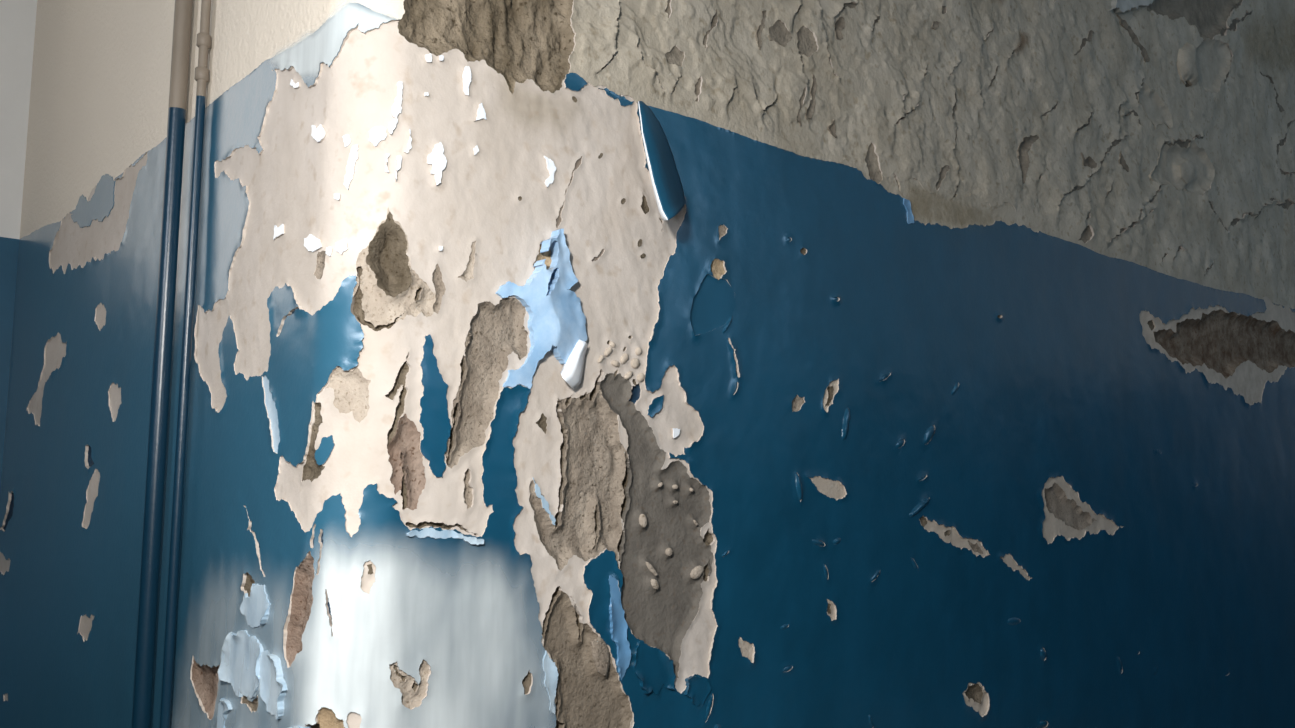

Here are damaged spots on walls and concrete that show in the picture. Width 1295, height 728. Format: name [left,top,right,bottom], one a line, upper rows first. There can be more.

crack [842,2,880,31]
crack [924,29,1019,141]
crack [1041,14,1203,219]
crack [1220,0,1252,84]
crack [1209,72,1292,231]
peeling [50,154,147,274]
crack [1116,185,1161,237]
peeling [192,0,716,728]
flaking render [1139,297,1295,405]
peeling [810,476,845,500]
peeling [919,516,1030,580]
peeling [1042,476,1123,544]